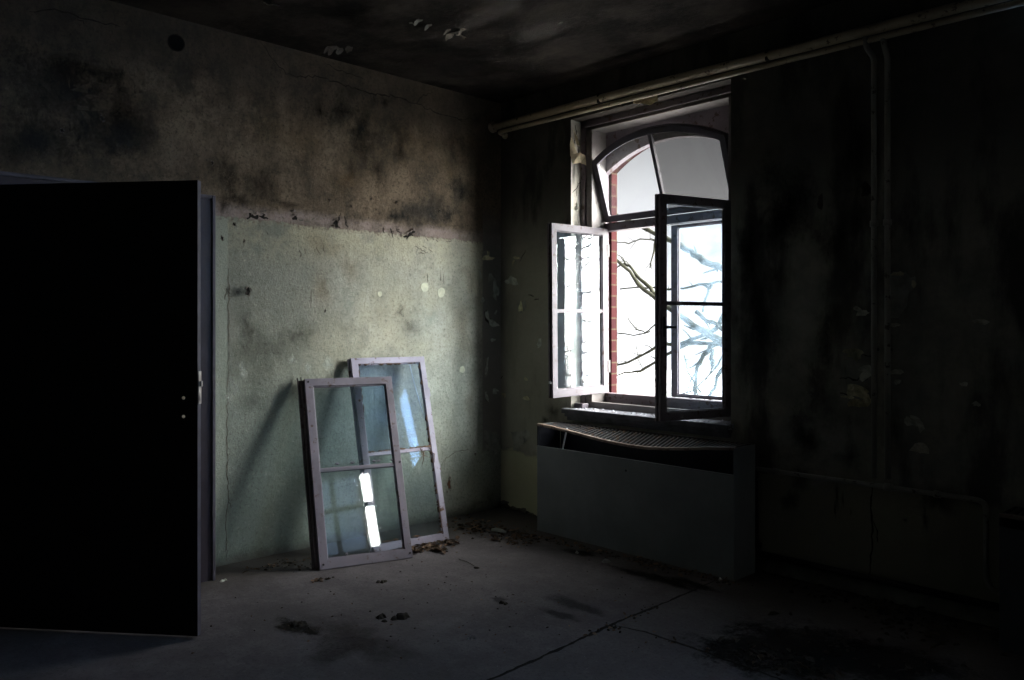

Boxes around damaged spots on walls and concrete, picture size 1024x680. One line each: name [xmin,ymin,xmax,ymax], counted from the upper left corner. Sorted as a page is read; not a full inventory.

peeling [409,19,467,41]
crack [223,270,231,561]